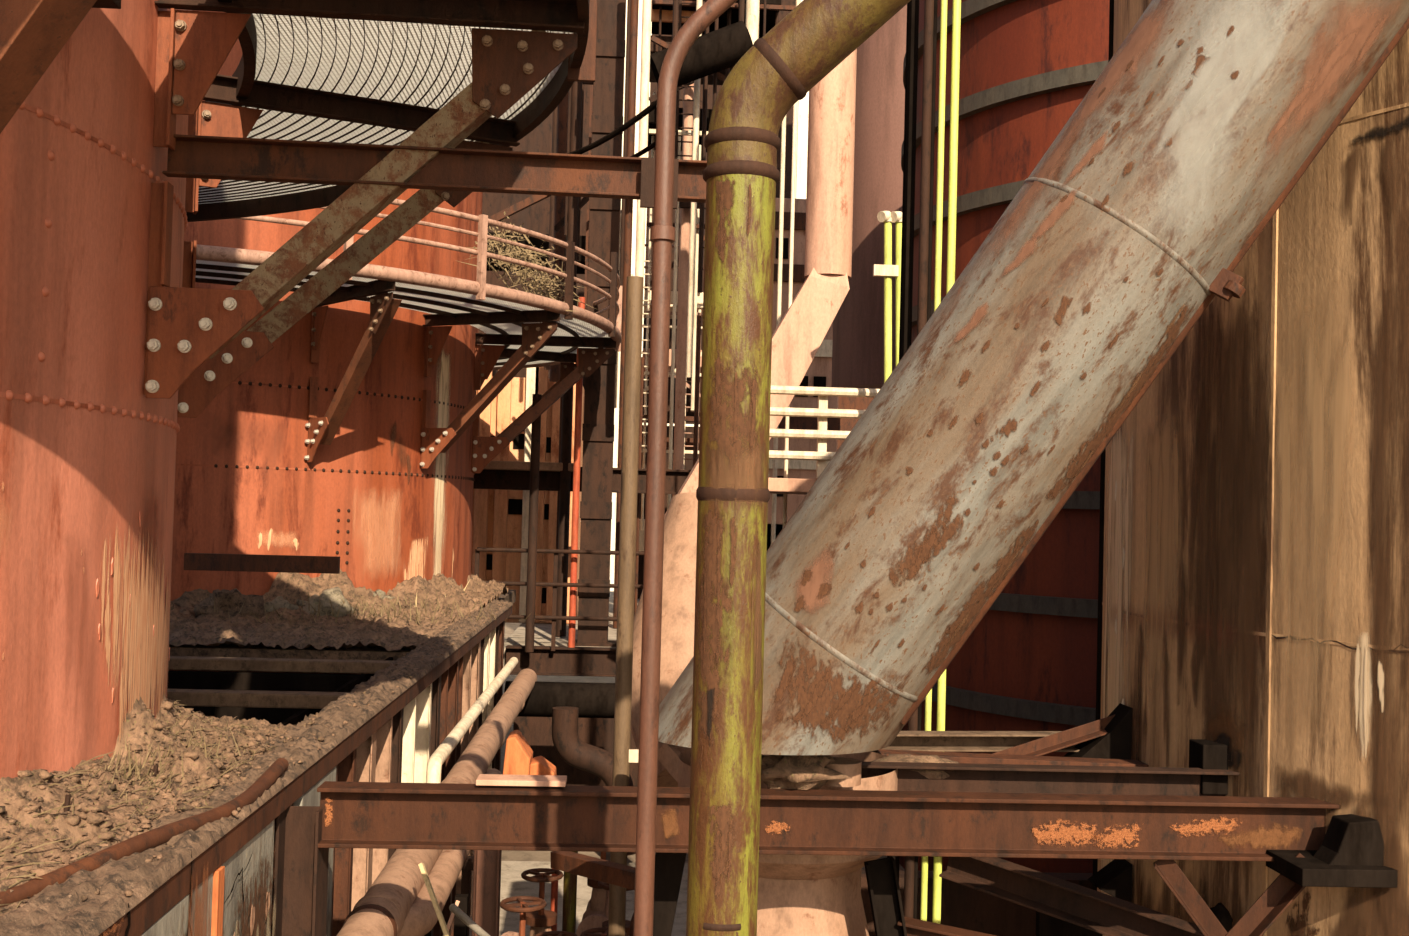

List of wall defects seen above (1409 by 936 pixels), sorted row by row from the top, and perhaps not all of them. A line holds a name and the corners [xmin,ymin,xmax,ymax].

peeling [96,512,171,742]
peeling [707,688,715,746]
peeling [1103,429,1133,718]
crack [1272,635,1408,653]
damp [1355,288,1409,867]
rust [189,869,210,936]